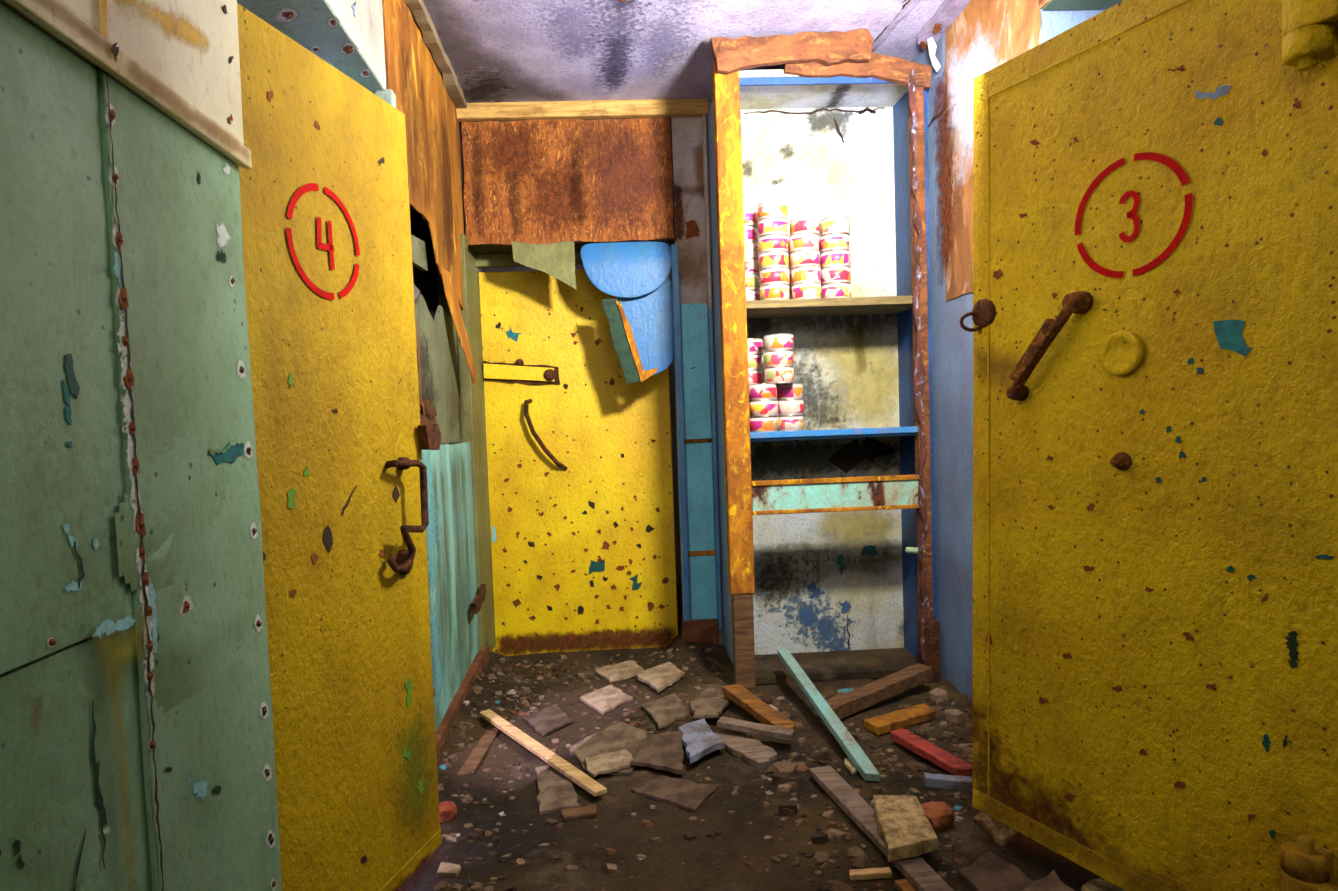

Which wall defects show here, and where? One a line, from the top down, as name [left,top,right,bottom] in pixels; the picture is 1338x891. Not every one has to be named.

leakage [593,0,651,89]
corrosion [379,0,464,309]
corrosion [490,126,587,230]
corrosion [594,136,700,241]
corrosion [696,147,704,195]
corrosion [118,288,129,310]
corrosion [123,369,135,390]
corrosion [136,510,150,586]
corrosion [496,495,675,656]
leakage [755,510,898,604]